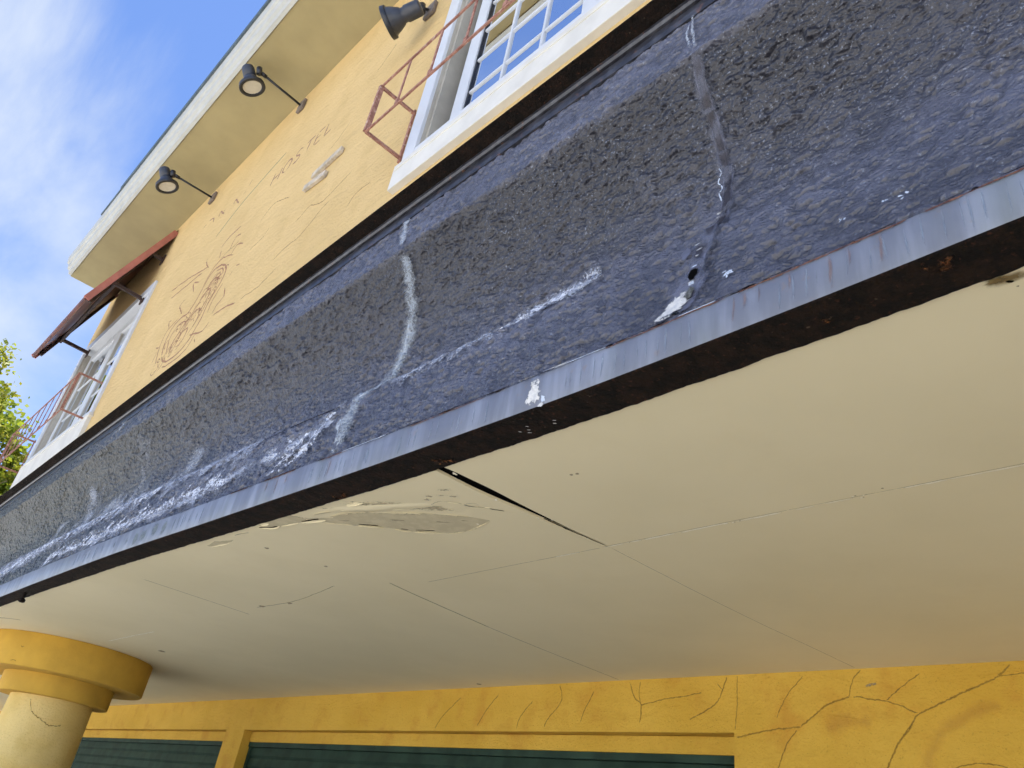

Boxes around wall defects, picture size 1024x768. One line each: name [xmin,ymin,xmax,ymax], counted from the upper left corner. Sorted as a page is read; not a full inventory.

crack [540,25,1024,374]
spalling [654,265,706,324]
damp [0,257,601,579]
crack [231,386,508,494]
spalling [518,361,568,407]
peeling [259,503,489,534]
crack [390,463,1024,768]